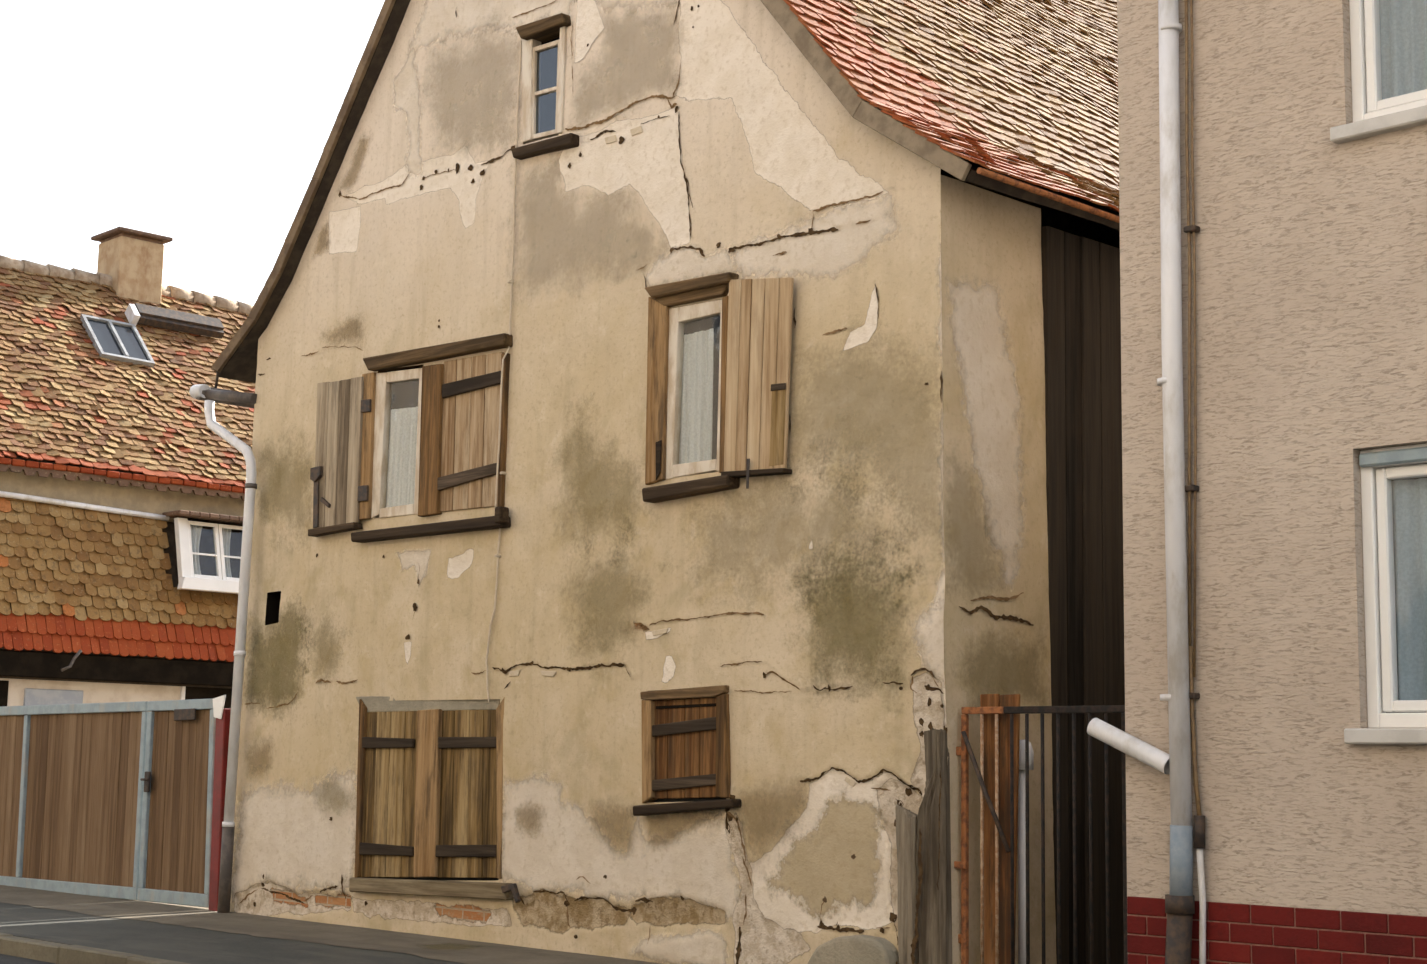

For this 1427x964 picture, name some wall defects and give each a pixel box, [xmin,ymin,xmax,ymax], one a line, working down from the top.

crack [512,0,589,80]
crack [338,145,515,200]
crack [565,63,883,287]
peeling [843,287,878,350]
peeling [932,416,945,652]
crack [634,612,764,636]
crack [959,592,1034,626]
crack [471,661,630,689]
crack [720,661,948,737]
peeling [231,670,946,964]
crack [725,794,752,964]
crack [800,767,942,964]